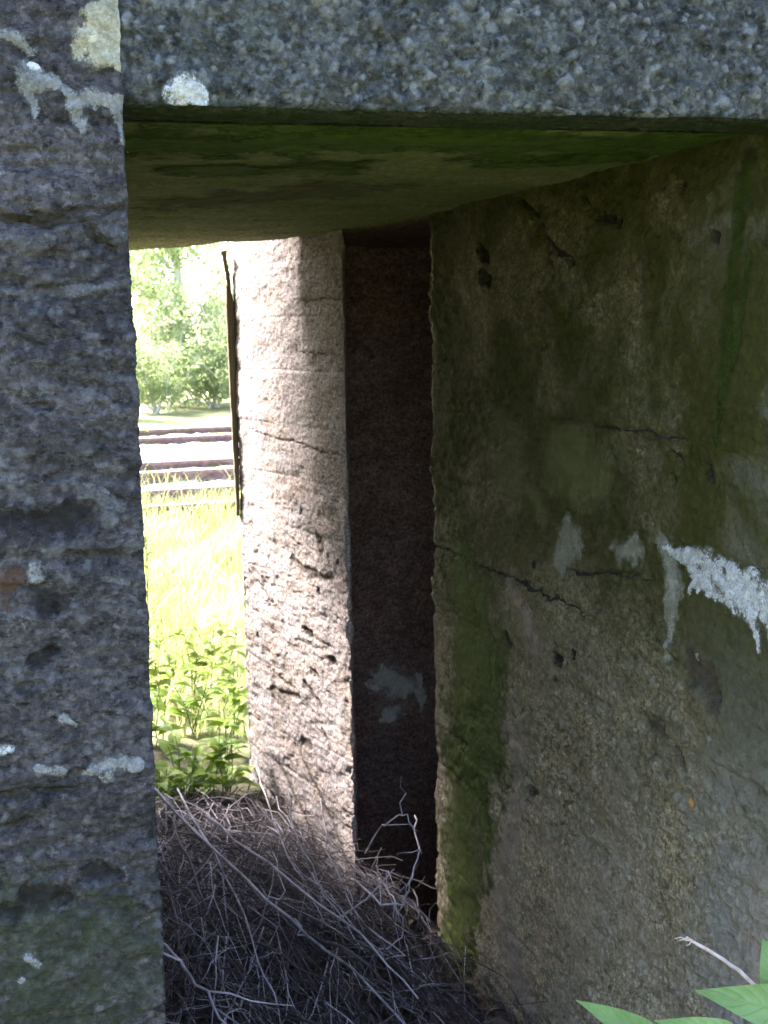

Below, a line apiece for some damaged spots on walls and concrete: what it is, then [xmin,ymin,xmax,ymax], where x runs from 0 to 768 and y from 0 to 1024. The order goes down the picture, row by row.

leakage [0,28,124,145]
crack [249,429,340,456]
crack [550,417,692,460]
crack [442,548,596,619]
crack [569,568,656,581]
leakage [662,545,768,660]